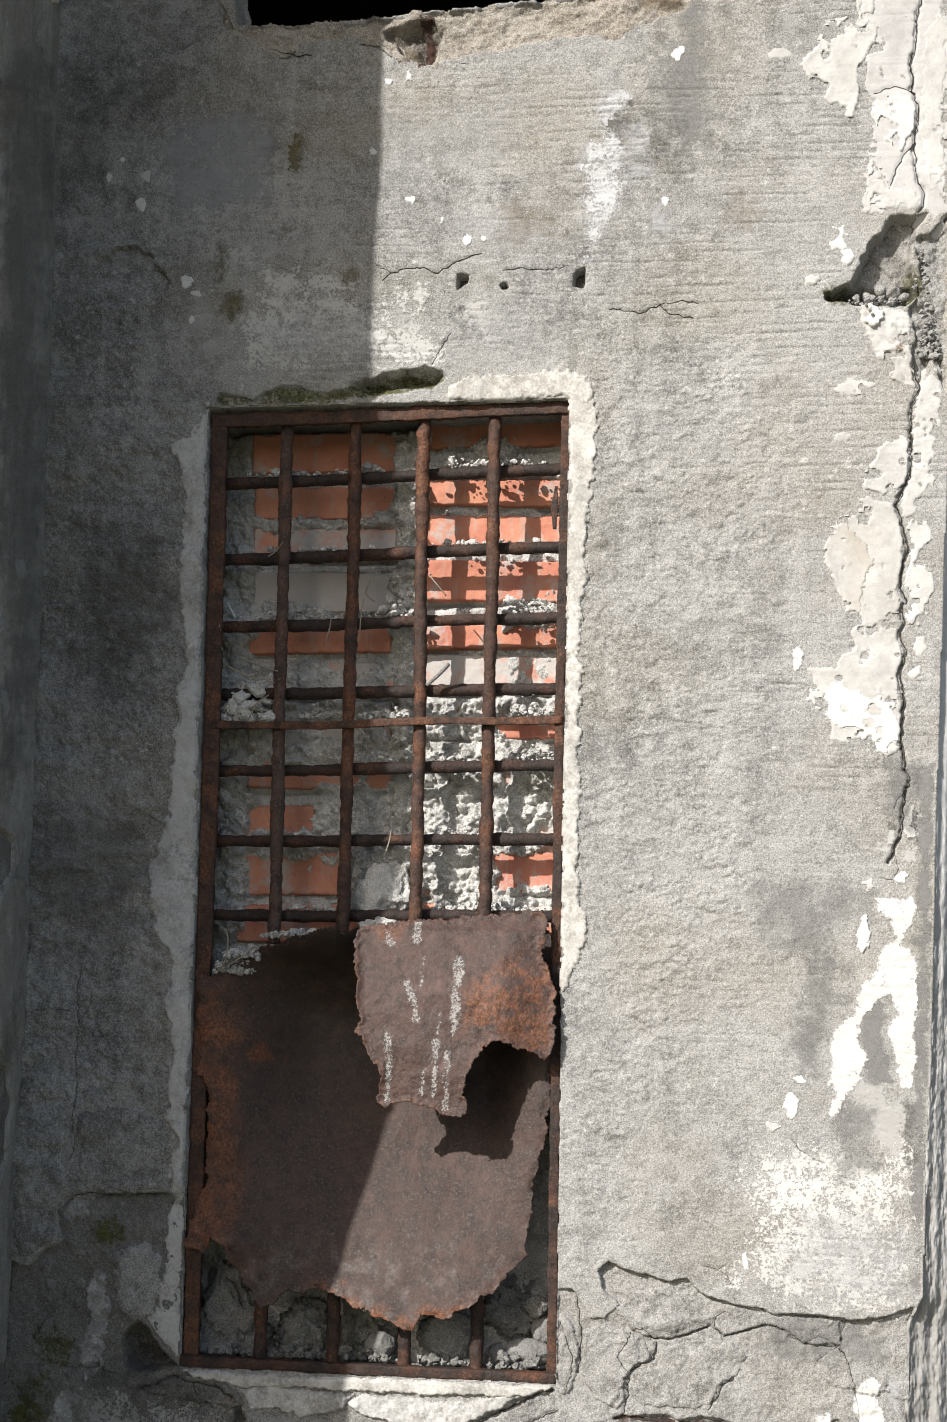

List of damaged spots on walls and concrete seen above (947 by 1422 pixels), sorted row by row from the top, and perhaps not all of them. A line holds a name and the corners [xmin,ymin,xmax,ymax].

spalling [217,0,690,69]
water stain [171,235,505,405]
peeling [768,0,947,756]
crack [887,364,920,880]
peeling [863,804,917,863]
corrosion [183,909,557,1331]
peeling [0,896,922,1422]
crack [39,1332,233,1409]
crack [480,1295,582,1422]
crack [617,1263,859,1420]